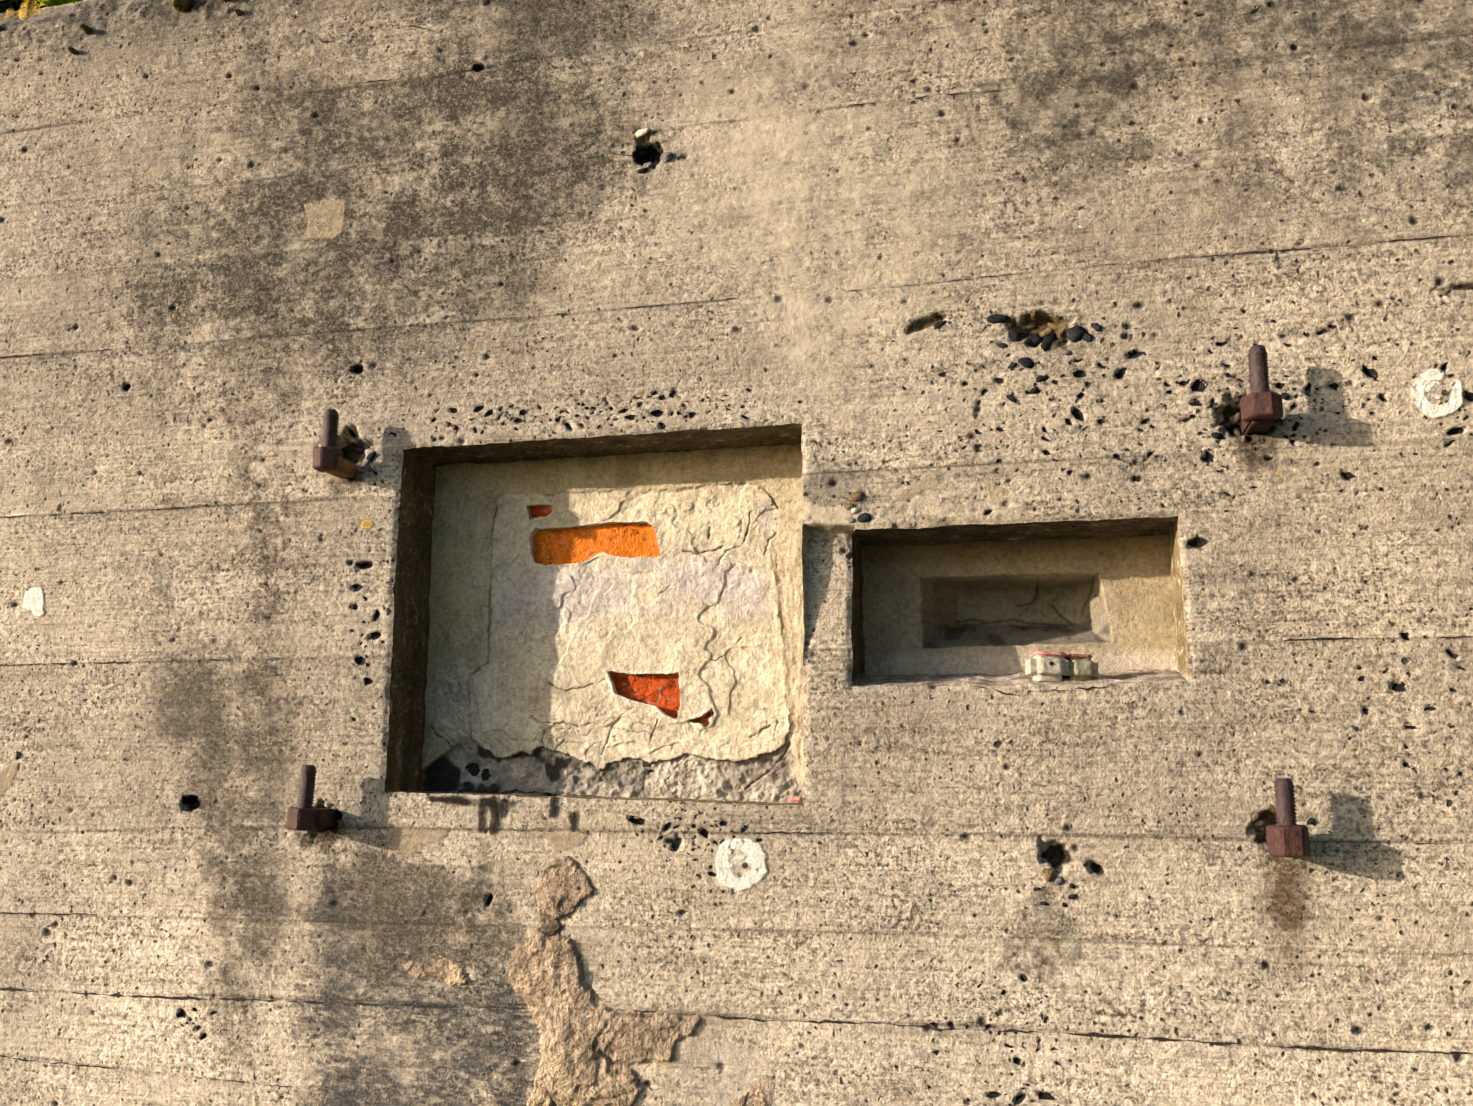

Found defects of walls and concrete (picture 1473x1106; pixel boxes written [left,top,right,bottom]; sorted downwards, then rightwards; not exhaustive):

leakage [131,0,658,586]
spalling [928,311,1144,490]
spalling [1102,309,1276,473]
spalling [1361,356,1401,415]
hole [1444,391,1473,447]
flaking render [526,502,661,566]
flaking render [607,670,714,728]
leakage [159,655,285,952]
leakage [426,762,515,834]
leakage [549,797,577,832]
leakage [292,850,541,1106]
flaking render [506,829,703,1106]